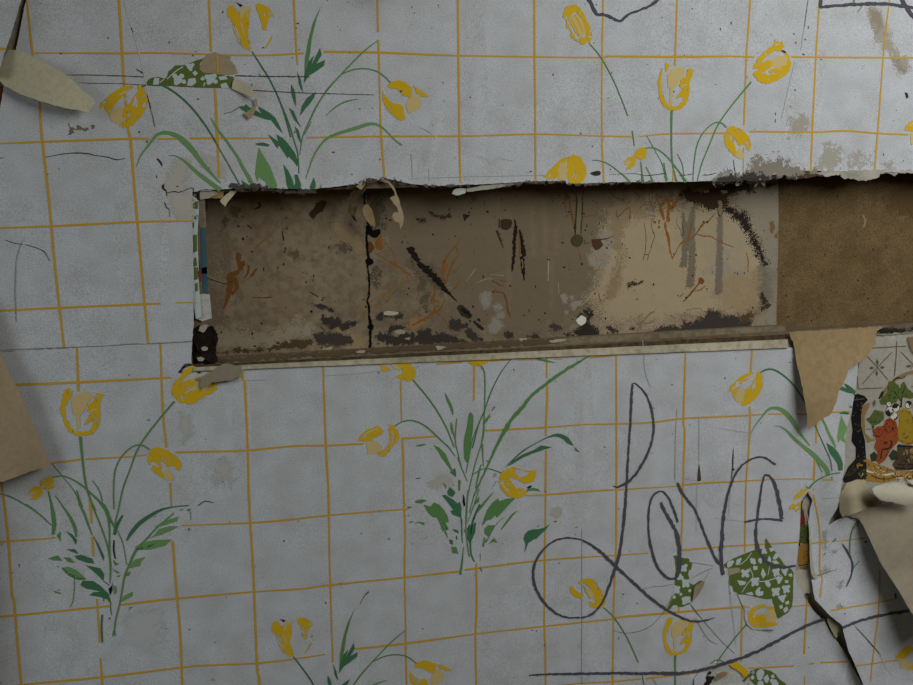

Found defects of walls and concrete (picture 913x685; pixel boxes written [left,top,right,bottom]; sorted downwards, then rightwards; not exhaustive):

spalling [309,200,326,219]
spalling [366,224,381,238]
spalling [496,219,526,280]
spalling [592,236,612,250]
spalling [406,246,472,319]
peeling [693,661,786,685]